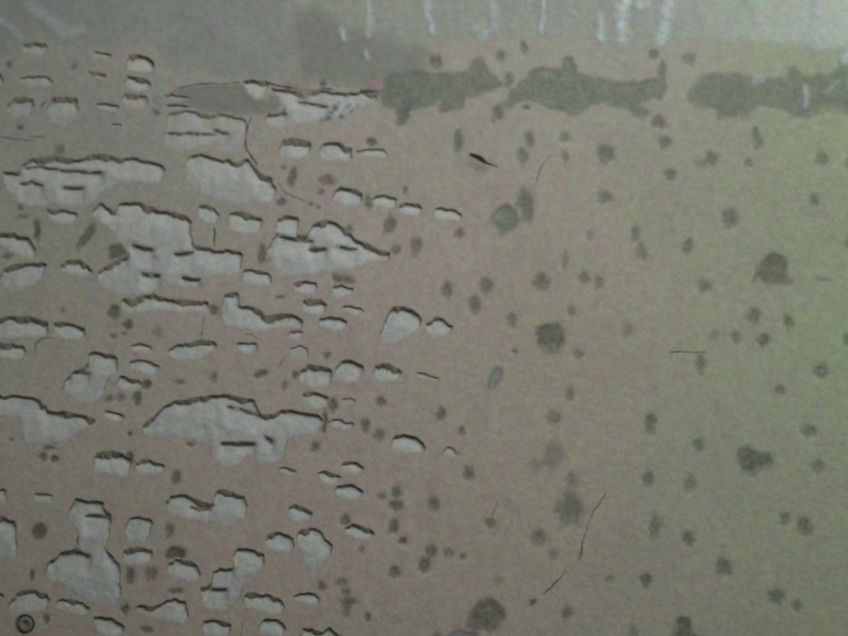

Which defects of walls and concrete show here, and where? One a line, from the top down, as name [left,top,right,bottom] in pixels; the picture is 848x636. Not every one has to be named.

peeling [243,57,500,129]
spalling [0,94,402,476]
spalling [391,434,426,454]
spalling [0,498,333,636]
spalling [165,489,248,527]
crack [543,493,606,596]